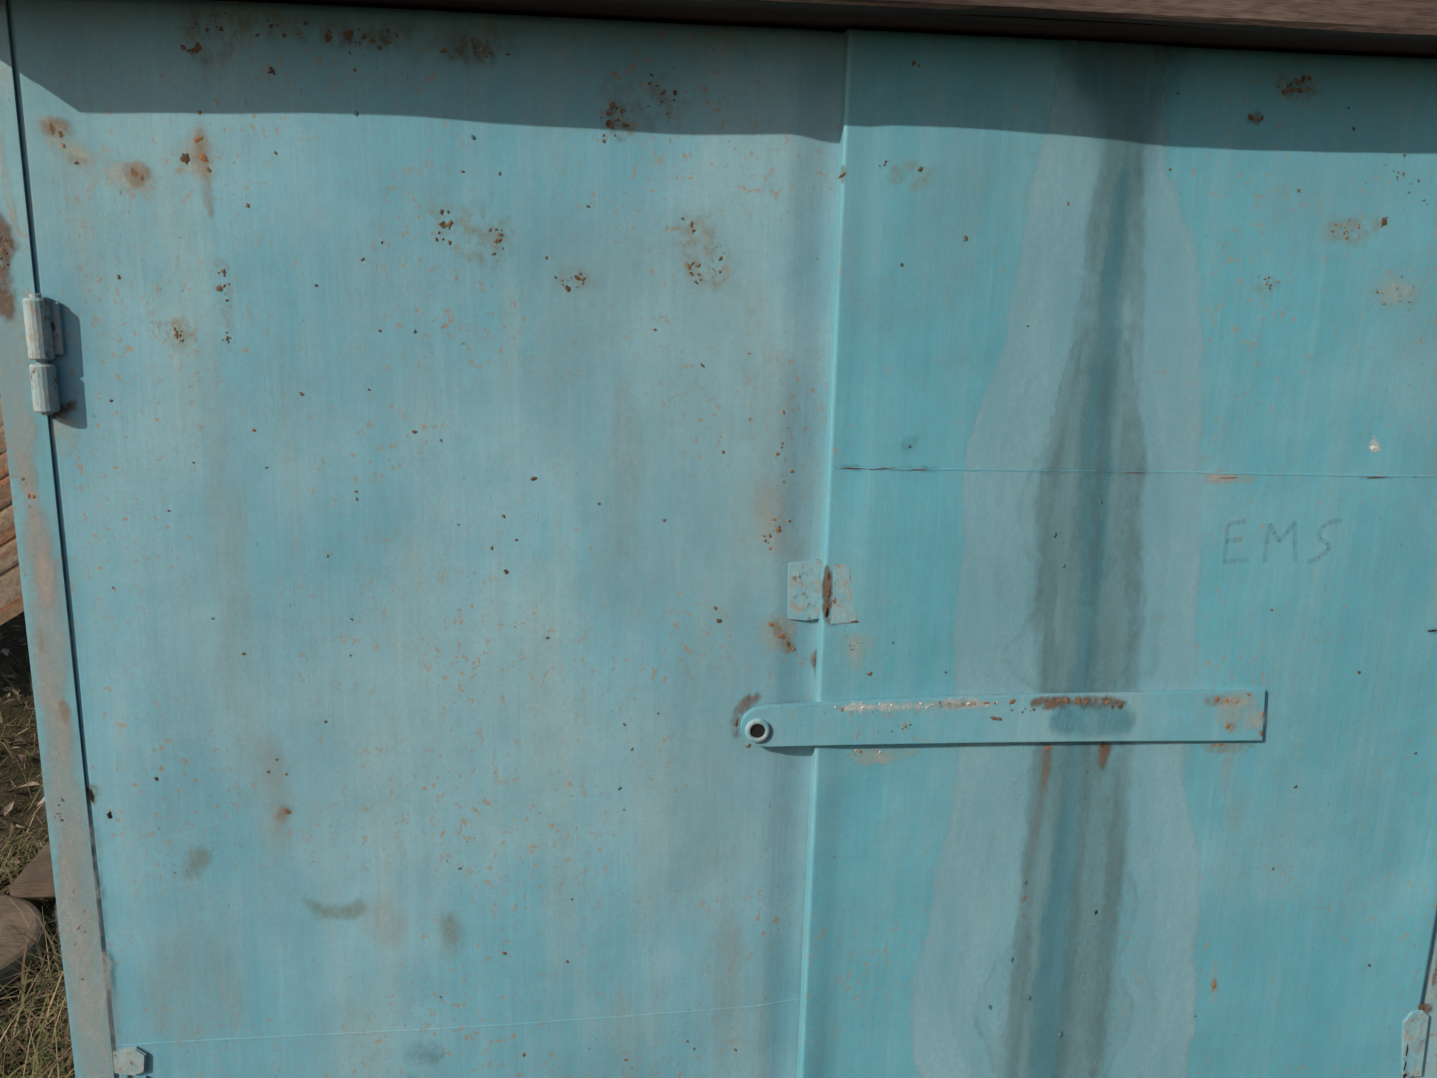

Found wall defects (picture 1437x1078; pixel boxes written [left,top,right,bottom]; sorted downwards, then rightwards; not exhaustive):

rust [180,136,211,176]
rust [0,217,14,318]
leakage [960,41,1168,696]
rust [733,694,759,748]
rust [835,697,1127,732]
rust [1211,693,1264,746]
leakage [915,741,1107,1078]
leakage [1130,741,1197,1078]